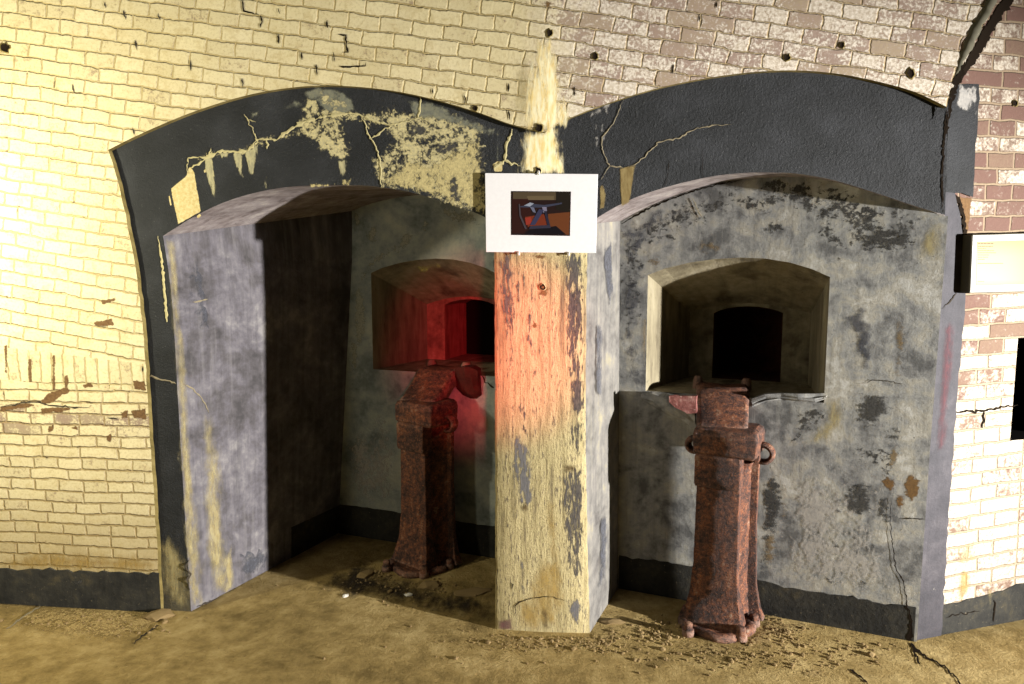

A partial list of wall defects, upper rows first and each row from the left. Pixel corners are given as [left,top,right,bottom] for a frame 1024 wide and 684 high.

leakage [523,39,567,174]
peeling [169,167,206,224]
crack [601,105,738,224]
peeling [604,246,613,304]
leakage [621,179,934,317]
spalling [0,355,70,432]
spalling [121,409,146,419]
leakage [792,406,839,441]
leakage [857,393,899,475]
crack [956,405,1016,428]
rust [882,475,920,506]
crack [890,500,961,684]